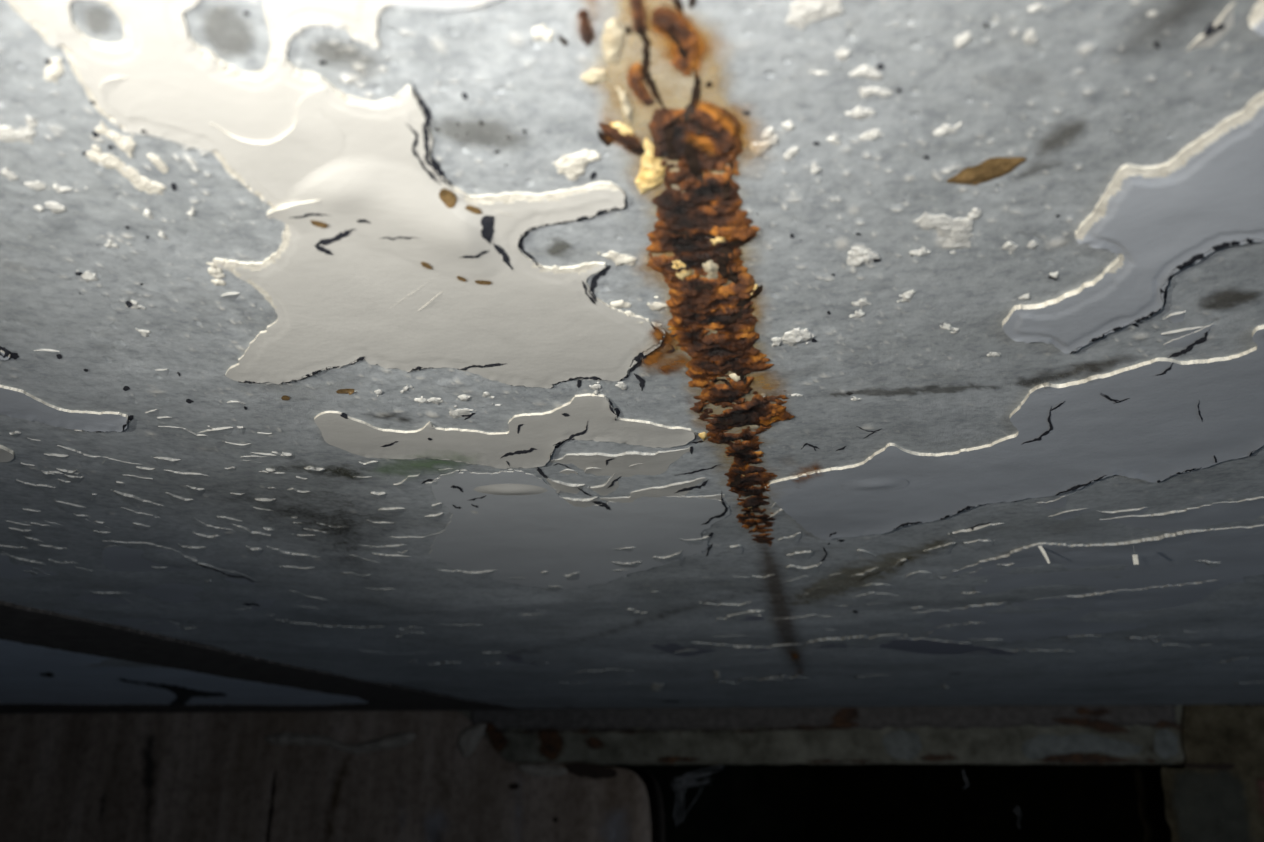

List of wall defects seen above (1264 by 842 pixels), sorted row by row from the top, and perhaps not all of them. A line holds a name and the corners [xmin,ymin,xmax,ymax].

peeling [955,22,988,48]
peeling [1023,29,1038,44]
peeling [1187,0,1264,51]
peeling [835,47,902,141]
peeling [0,0,730,588]
rust [558,0,800,667]
peeling [761,91,1264,651]